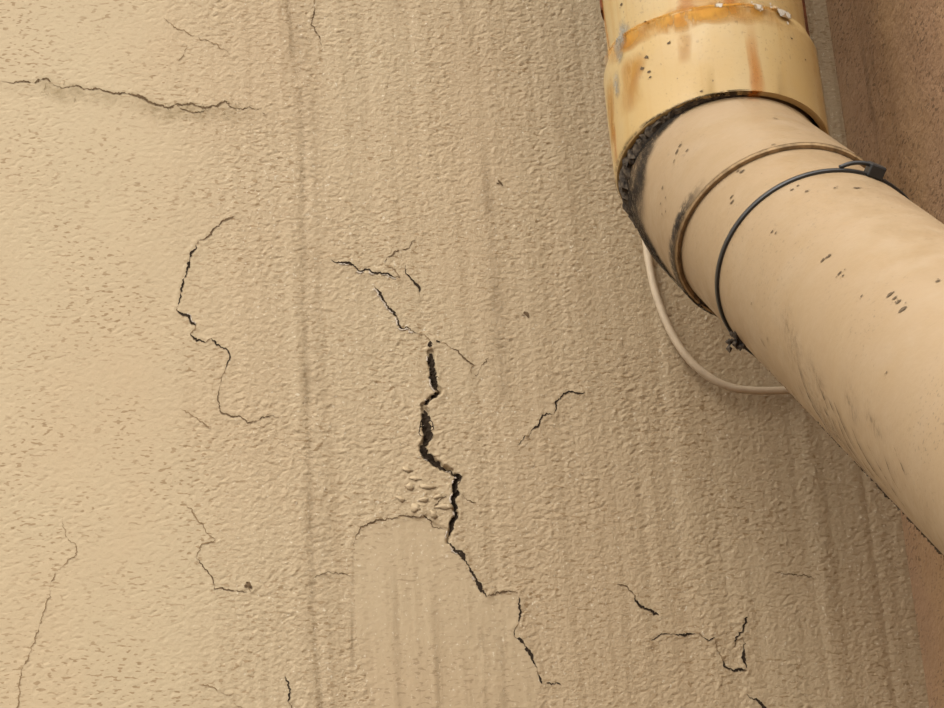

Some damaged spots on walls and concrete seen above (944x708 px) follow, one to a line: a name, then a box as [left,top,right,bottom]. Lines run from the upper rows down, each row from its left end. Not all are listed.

crack [167,21,227,60]
corrosion [616,3,766,50]
peeling [751,1,791,24]
crack [3,78,265,114]
crack [176,216,278,429]
crack [519,391,585,444]
crack [332,240,561,685]
crack [187,507,252,592]
crack [618,584,749,672]